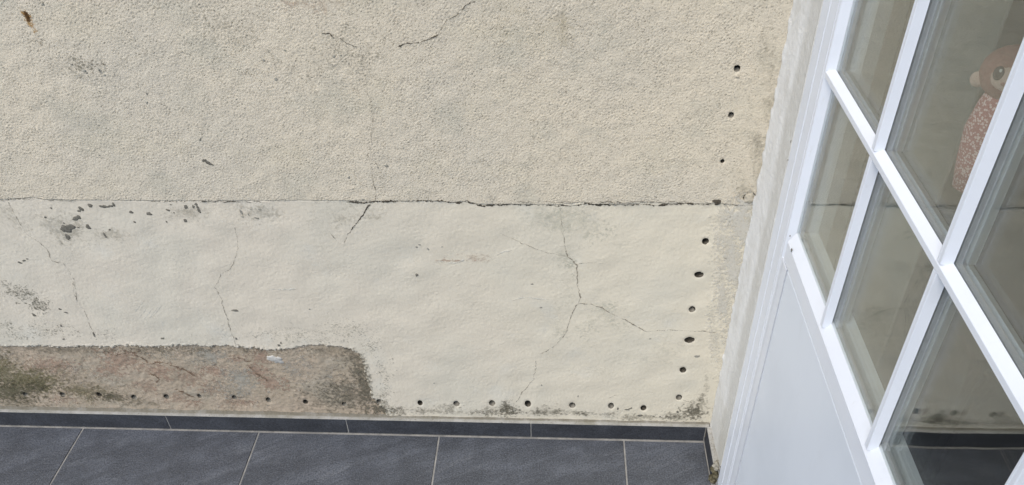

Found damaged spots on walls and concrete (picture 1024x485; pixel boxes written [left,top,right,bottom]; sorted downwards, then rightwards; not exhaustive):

crack [399,1,475,47]
crack [321,33,743,402]
spalling [0,308,386,414]